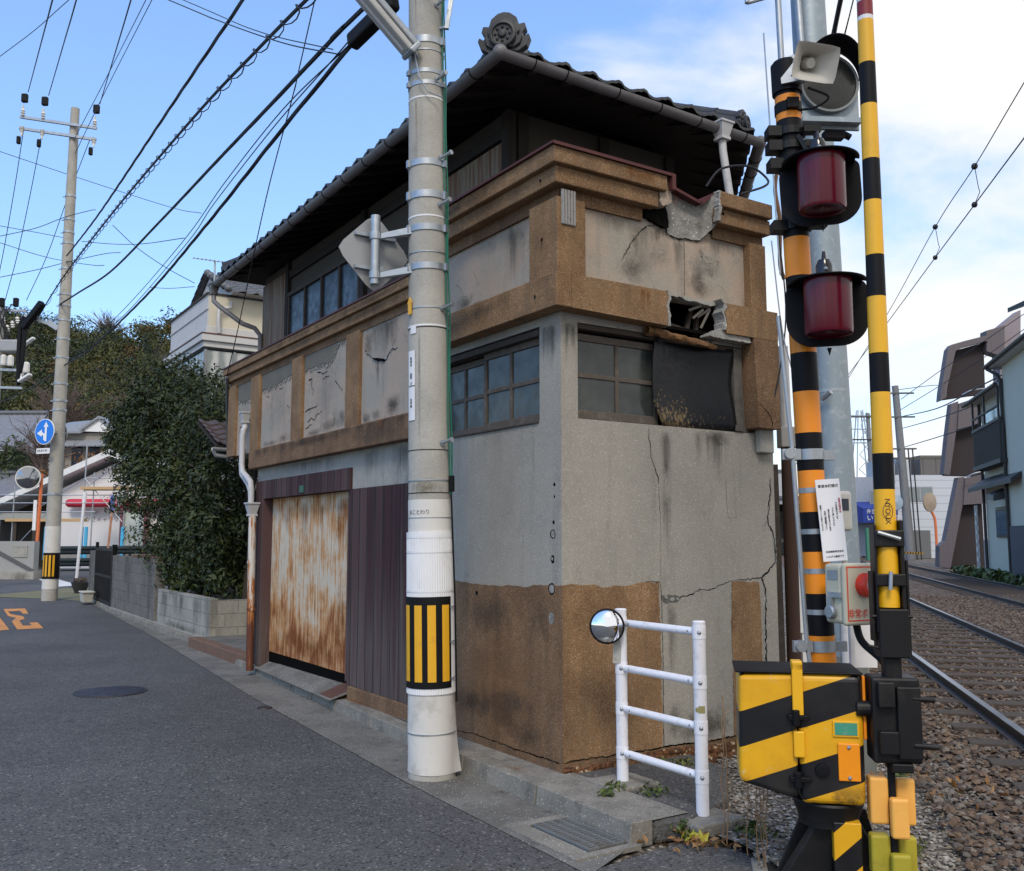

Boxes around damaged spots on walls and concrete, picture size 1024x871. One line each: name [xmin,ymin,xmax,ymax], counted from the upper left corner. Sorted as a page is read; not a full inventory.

spalling [642,182,724,240]
crack [621,225,705,296]
peeling [238,339,346,404]
crack [457,438,777,764]